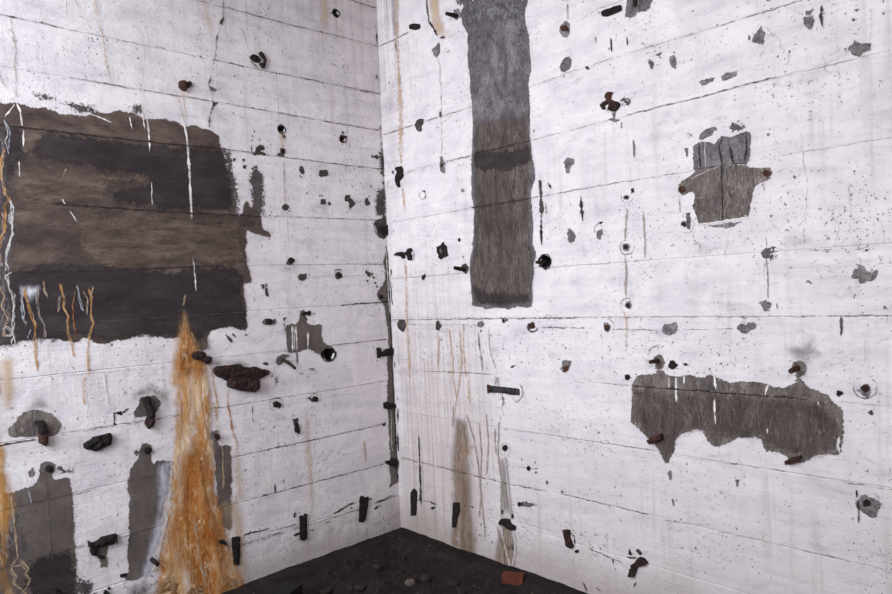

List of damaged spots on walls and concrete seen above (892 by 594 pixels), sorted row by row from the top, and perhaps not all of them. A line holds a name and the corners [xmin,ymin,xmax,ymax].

crack [0,0,461,169]
crack [628,77,776,115]
rust [0,148,10,243]
crack [51,203,278,217]
crack [409,126,585,172]
crack [453,173,674,212]
peeling [678,120,772,228]
leakage [2,199,15,344]
rust [21,283,94,404]
rust [0,446,12,535]
rust [144,325,243,594]
leakage [0,496,29,594]